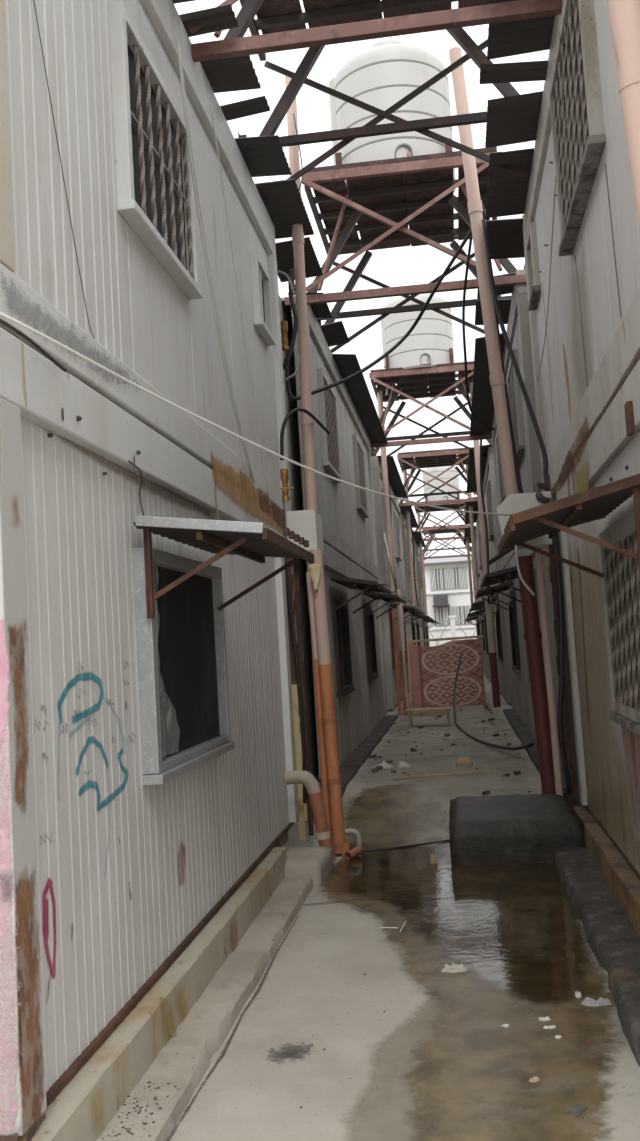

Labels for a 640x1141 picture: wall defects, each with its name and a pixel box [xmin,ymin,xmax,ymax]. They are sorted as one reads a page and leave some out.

rust [211,453,285,533]
rust [551,344,640,496]
rust [9,624,28,807]
peeling [0,730,46,1141]
rust [15,878,43,1129]
leakage [322,784,617,1141]